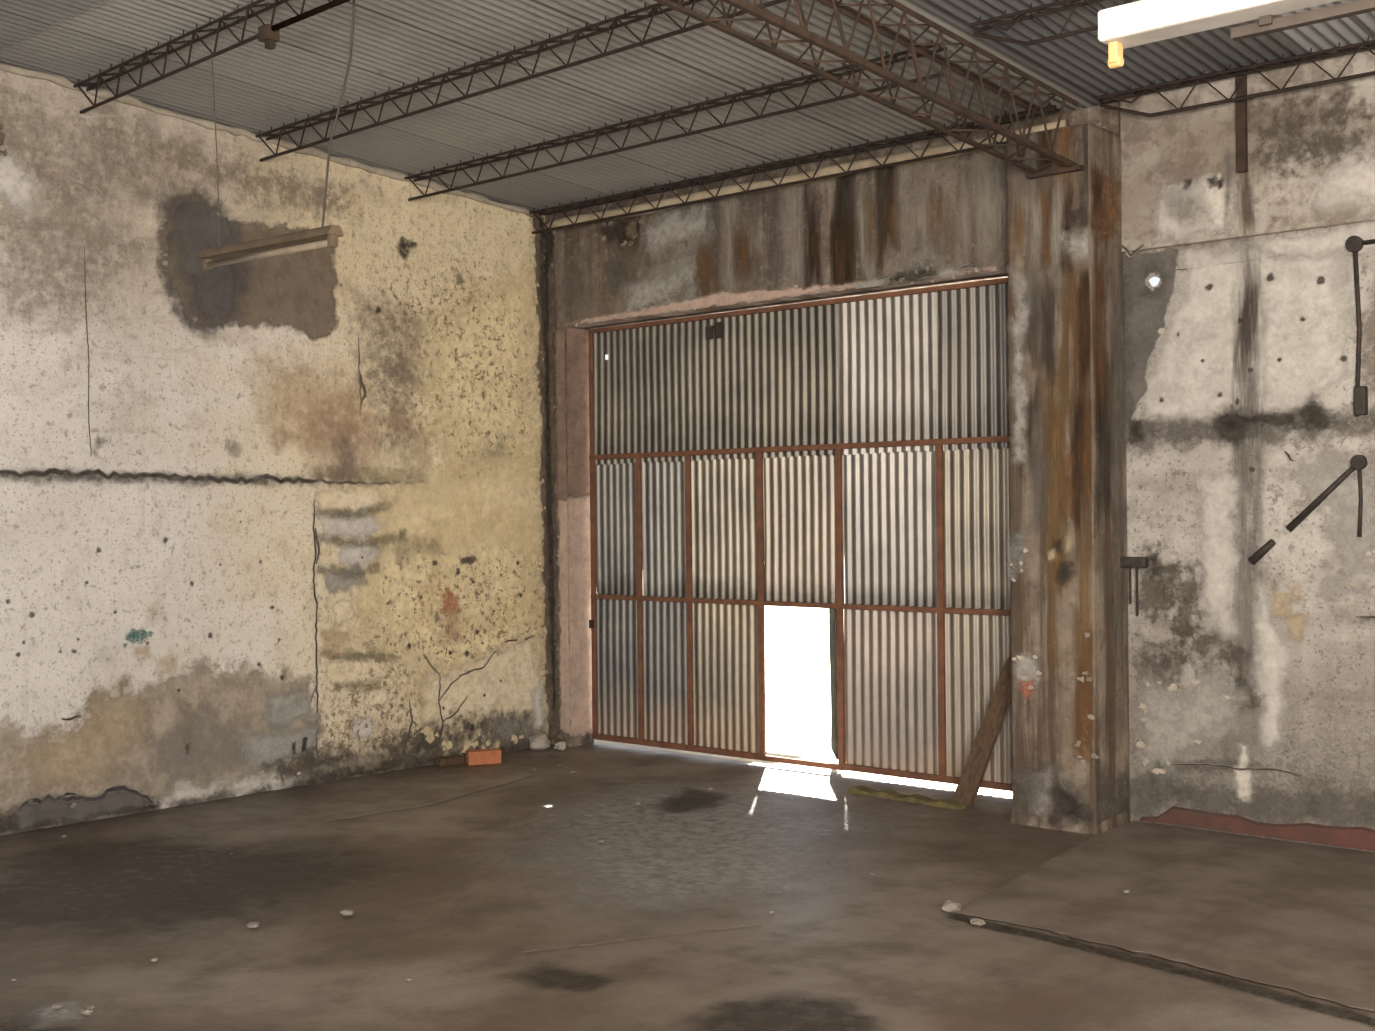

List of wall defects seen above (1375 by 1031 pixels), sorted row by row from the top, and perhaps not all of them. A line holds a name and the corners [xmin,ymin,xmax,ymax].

peeling [0,118,42,210]
damp [16,199,104,312]
flaking render [159,195,342,340]
crack [0,246,425,774]
damp [0,270,545,832]
rust [1043,261,1092,749]
damp [774,123,1375,828]
crack [402,626,535,751]
damp [0,842,375,931]